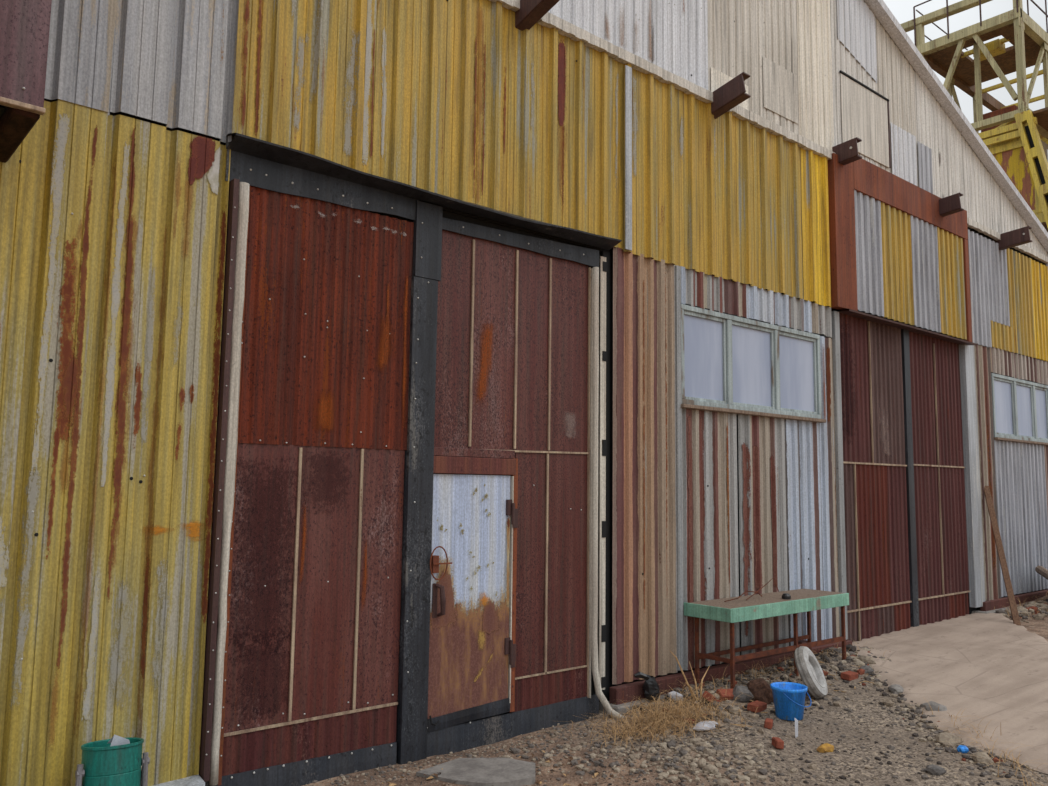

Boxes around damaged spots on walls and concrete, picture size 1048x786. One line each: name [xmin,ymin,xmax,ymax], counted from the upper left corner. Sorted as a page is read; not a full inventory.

corrosion [188,135,215,185]
corrosion [558,42,566,205]
peeling [0,114,70,707]
corrosion [46,125,98,669]
corrosion [107,128,143,602]
corrosion [477,325,493,399]
corrosion [141,555,150,678]
peeling [428,551,509,719]